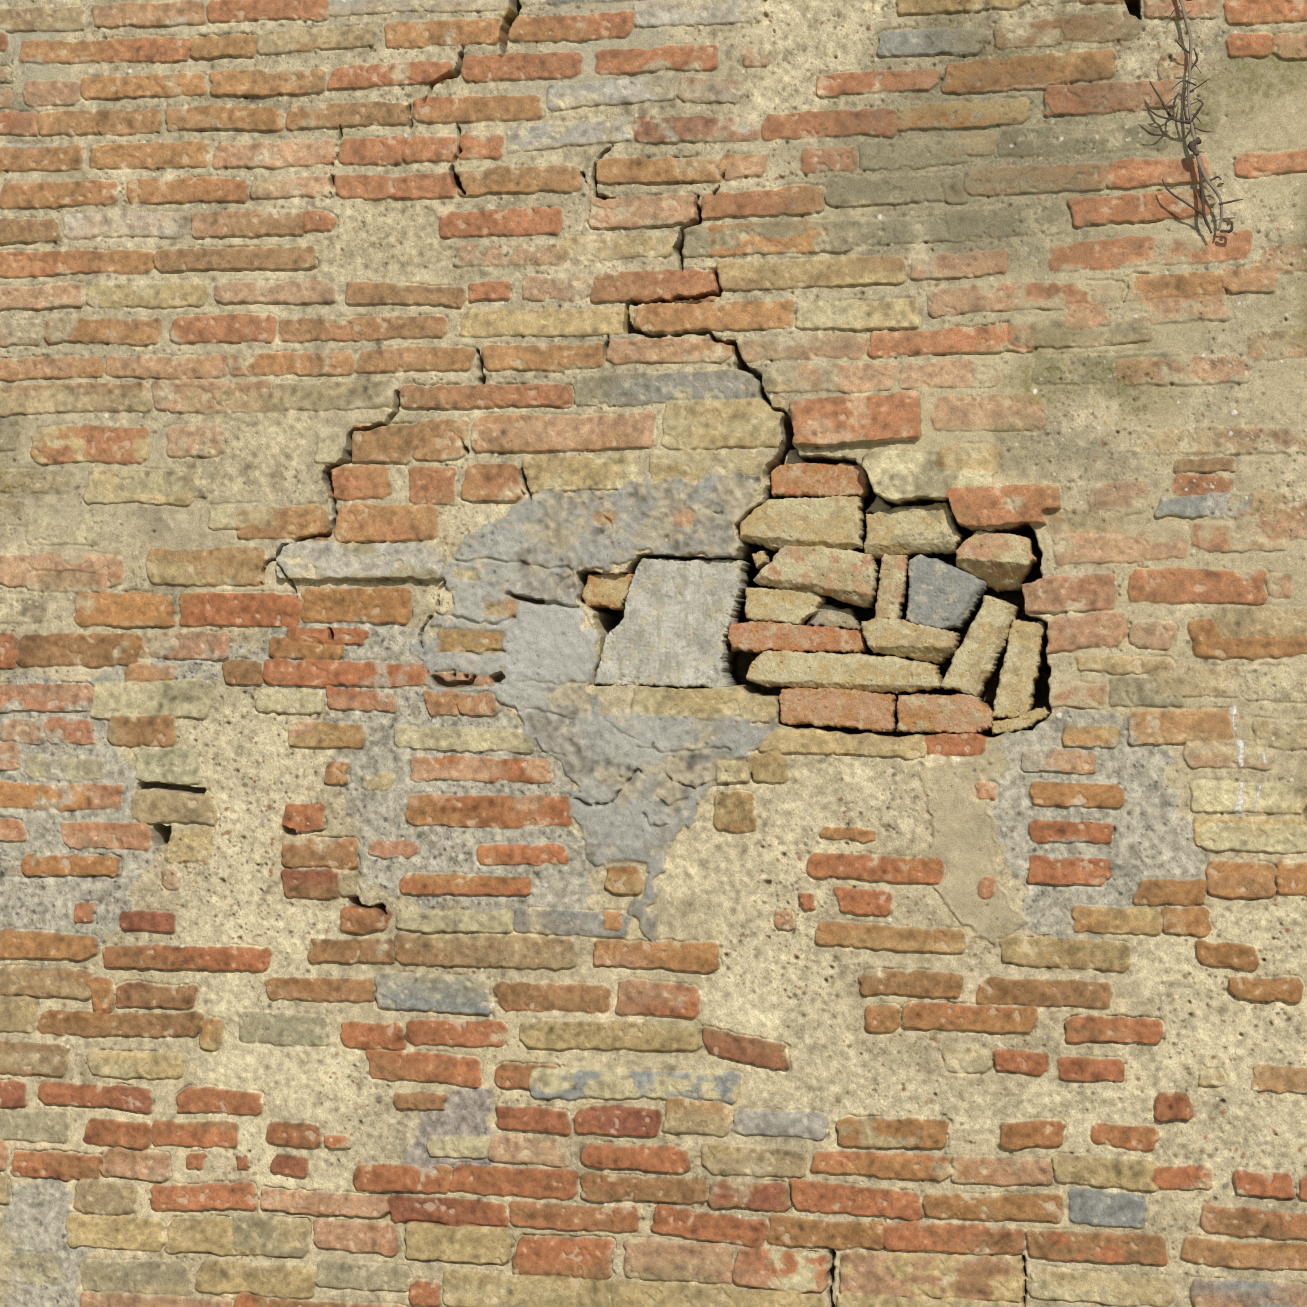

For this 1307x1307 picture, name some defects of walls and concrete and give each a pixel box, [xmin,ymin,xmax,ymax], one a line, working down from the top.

crack [498,0,522,58]
crack [406,46,465,129]
crack [448,122,466,195]
crack [580,145,621,200]
crack [602,169,795,496]
crack [258,389,400,598]
spalling [867,492,950,508]
spalling [576,445,858,686]
spalling [827,597,876,621]
spalling [951,521,1052,738]
spalling [429,671,505,690]
spalling [730,651,962,738]